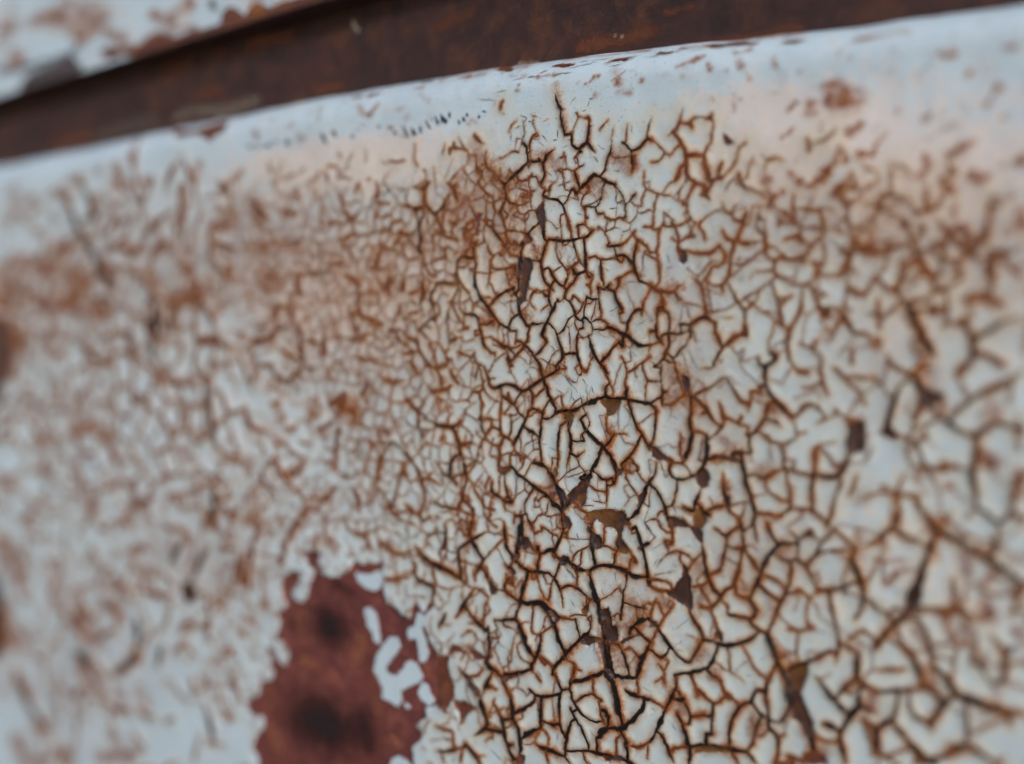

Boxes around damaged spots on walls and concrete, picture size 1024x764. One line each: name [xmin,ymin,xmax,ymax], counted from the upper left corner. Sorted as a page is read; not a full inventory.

rust [0,0,1024,166]
crack [78,295,282,452]
crack [283,94,1024,764]
crack [169,489,246,589]
crack [206,708,215,746]
peeling [245,551,487,764]